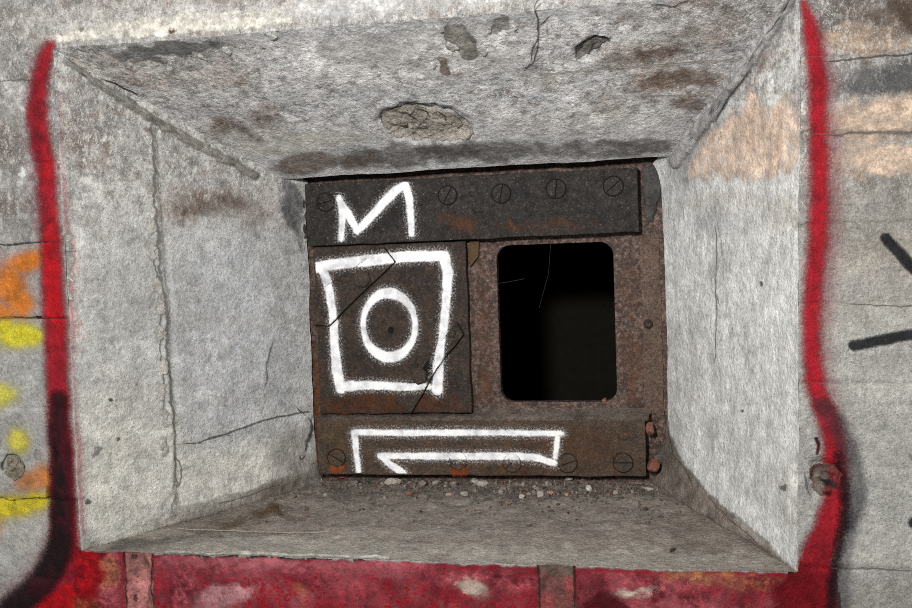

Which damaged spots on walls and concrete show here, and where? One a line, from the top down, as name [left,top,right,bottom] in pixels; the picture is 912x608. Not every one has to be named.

peeling [429,25,487,76]
peeling [484,15,517,34]
crack [525,0,741,75]
spalling [379,102,473,142]
leakage [224,127,652,175]
crack [147,127,314,487]